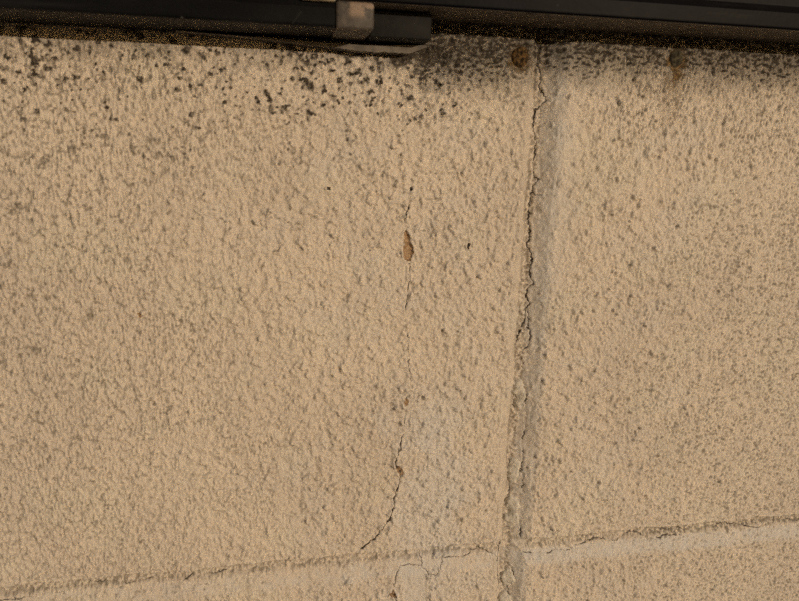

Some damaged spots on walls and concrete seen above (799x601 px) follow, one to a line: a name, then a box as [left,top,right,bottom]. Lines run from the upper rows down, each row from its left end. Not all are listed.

leakage [0,22,57,130]
leakage [65,29,113,74]
leakage [120,29,234,90]
leakage [223,21,799,125]
crack [508,33,547,493]
crack [361,333,412,549]
crack [388,523,682,601]